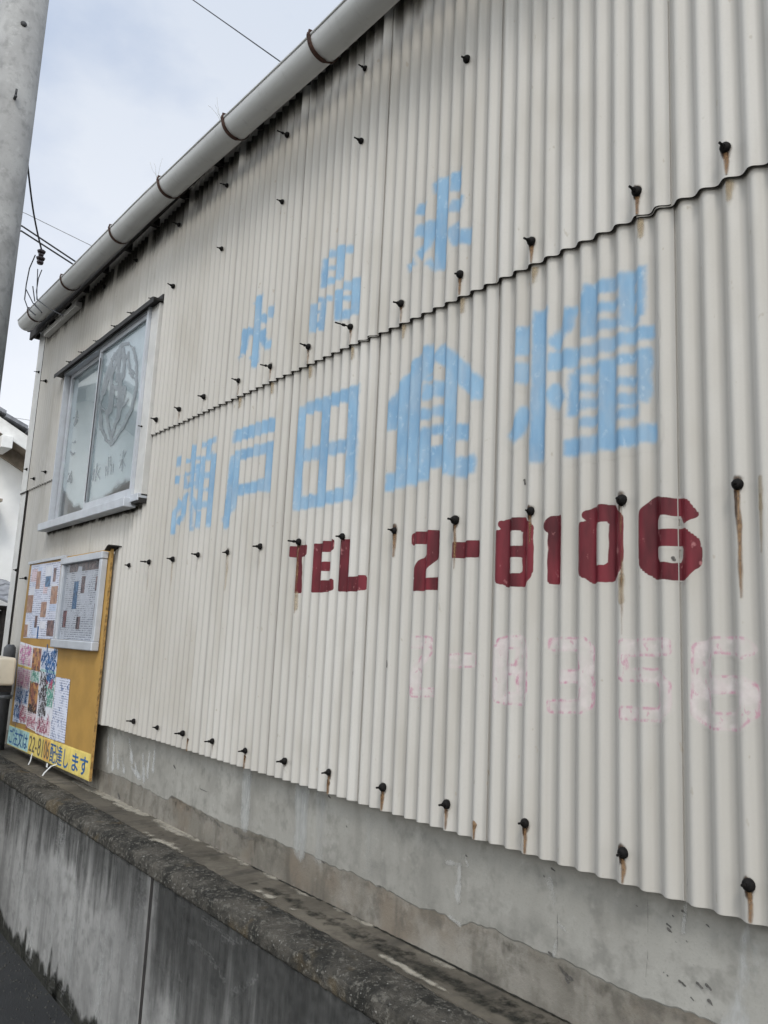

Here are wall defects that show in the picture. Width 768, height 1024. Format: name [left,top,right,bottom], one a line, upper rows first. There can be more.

rust [733,476,742,589]
damp [0,780,141,903]
damp [72,780,212,848]
rust [618,844,626,883]
rust [743,876,753,923]